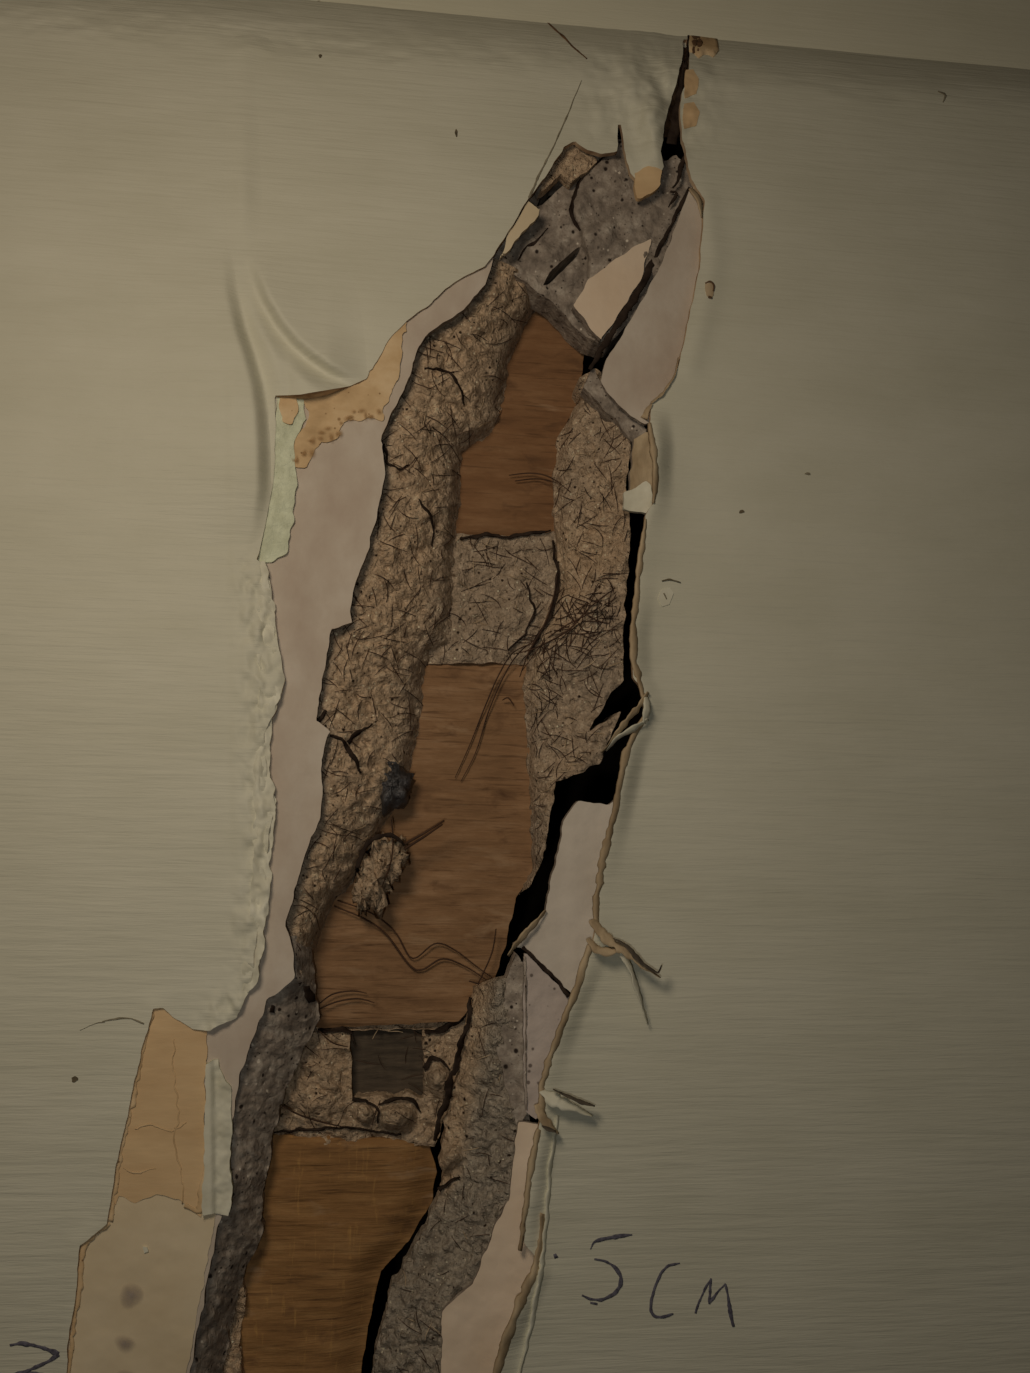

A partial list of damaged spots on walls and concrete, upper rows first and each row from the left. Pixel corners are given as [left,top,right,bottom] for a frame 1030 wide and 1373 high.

spalling [67,139,715,1373]
crack [588,35,719,371]